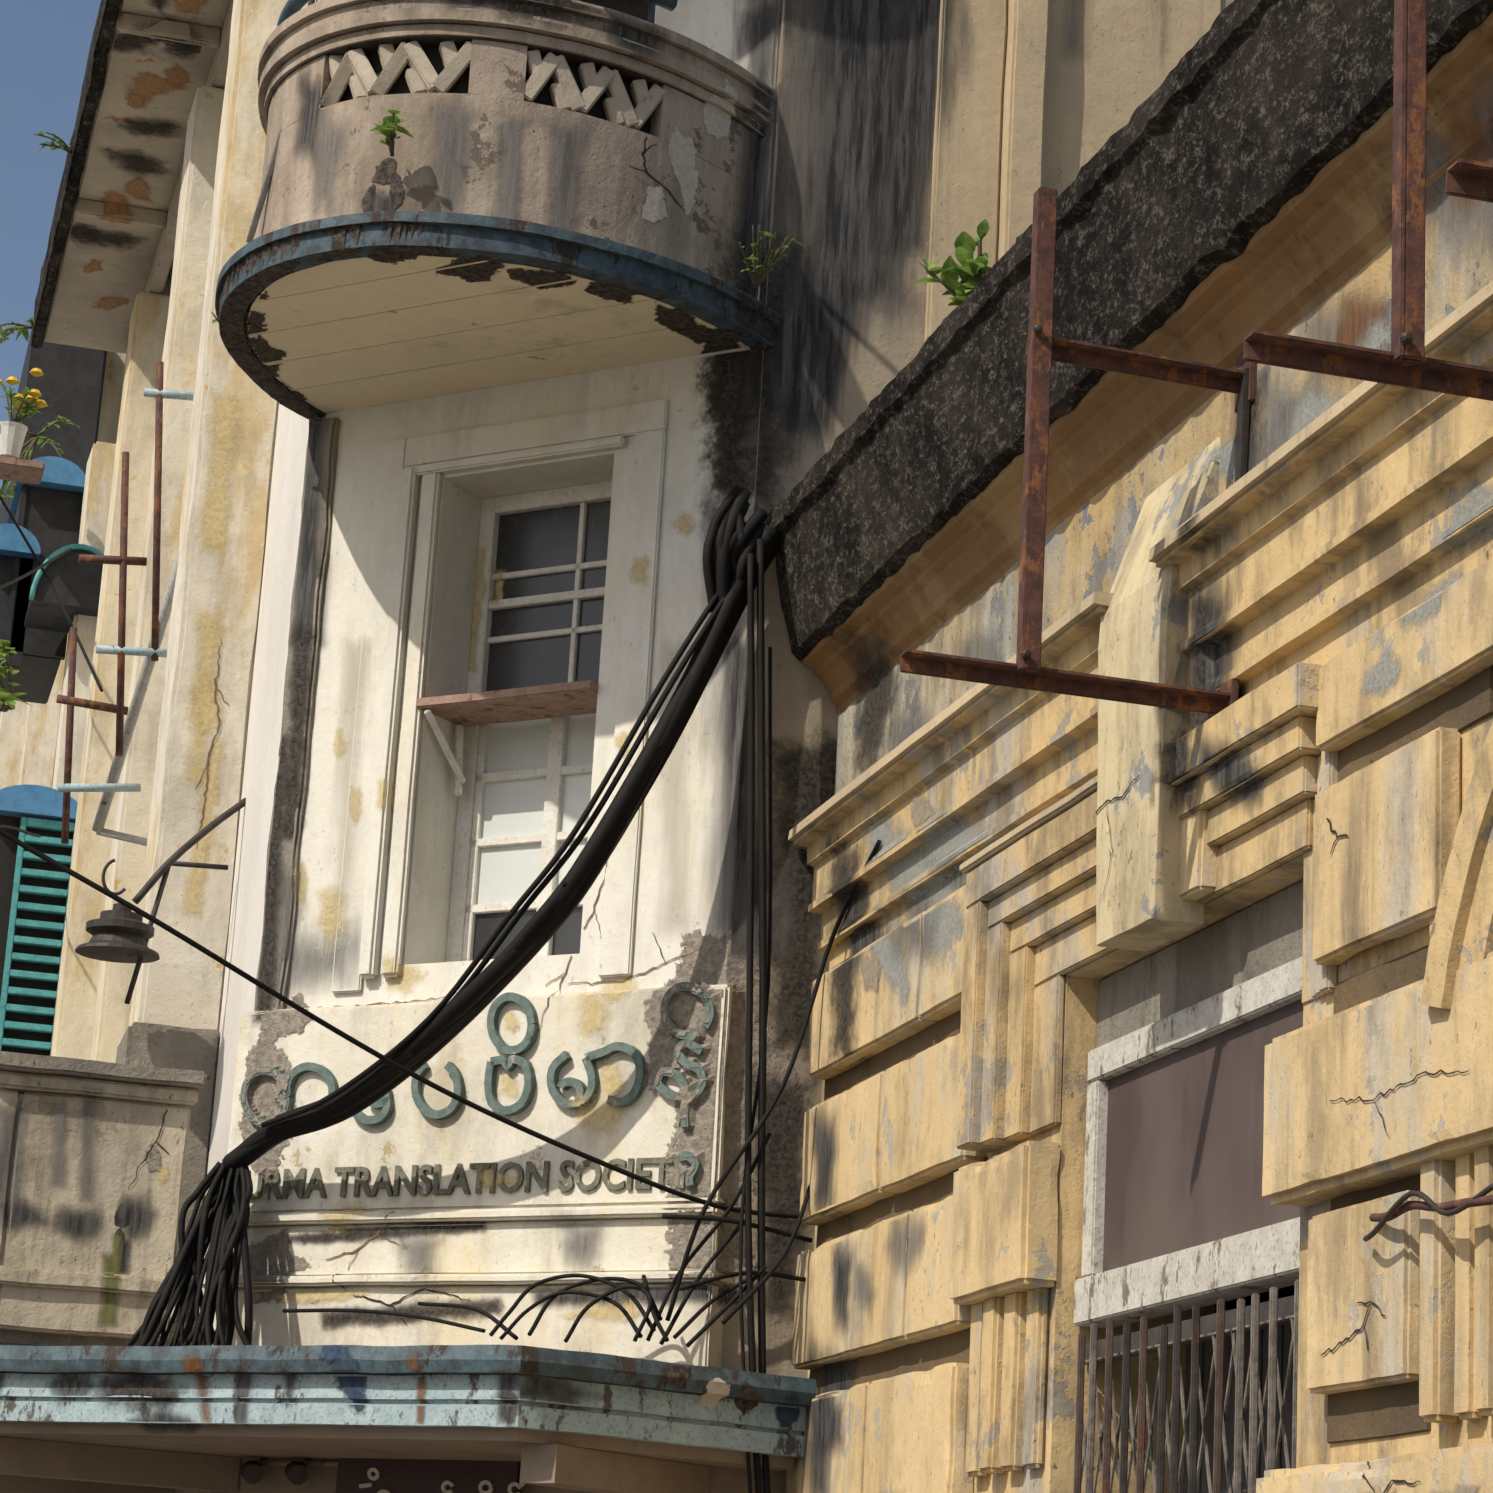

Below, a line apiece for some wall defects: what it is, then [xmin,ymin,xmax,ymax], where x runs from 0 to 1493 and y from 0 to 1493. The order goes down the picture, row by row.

peeling [215,235,319,433]
peeling [320,157,741,354]
damp [705,0,953,518]
rust [1338,304,1373,345]
crack [195,641,229,849]
peeling [583,929,803,1295]
crack [1330,1069,1469,1137]
rust [185,1359,209,1421]
rust [408,1359,426,1423]
damp [804,1349,851,1493]
damp [833,1247,850,1327]
crack [1321,1300,1385,1355]